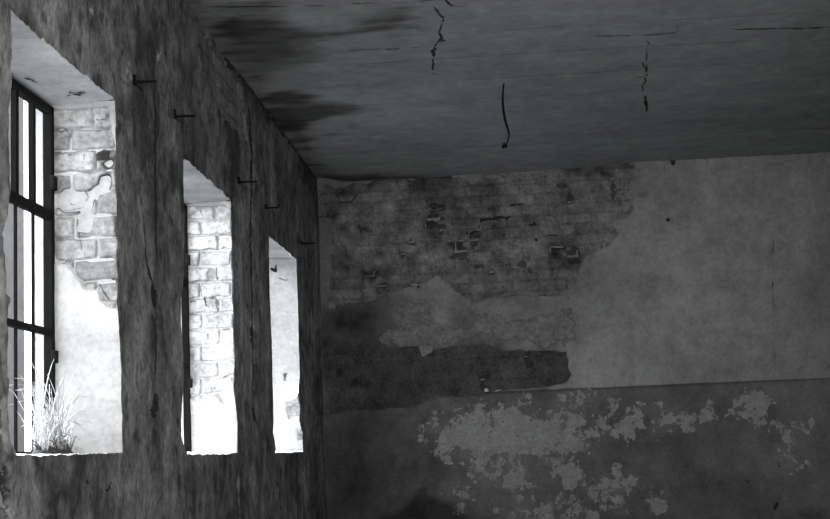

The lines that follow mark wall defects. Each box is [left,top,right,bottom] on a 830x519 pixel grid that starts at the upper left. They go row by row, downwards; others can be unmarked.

damp [217,18,340,62]
crack [399,0,460,75]
crack [607,26,678,112]
damp [259,92,354,150]
flaking render [50,100,121,308]
flaking render [318,162,640,309]
flaking render [322,345,815,519]